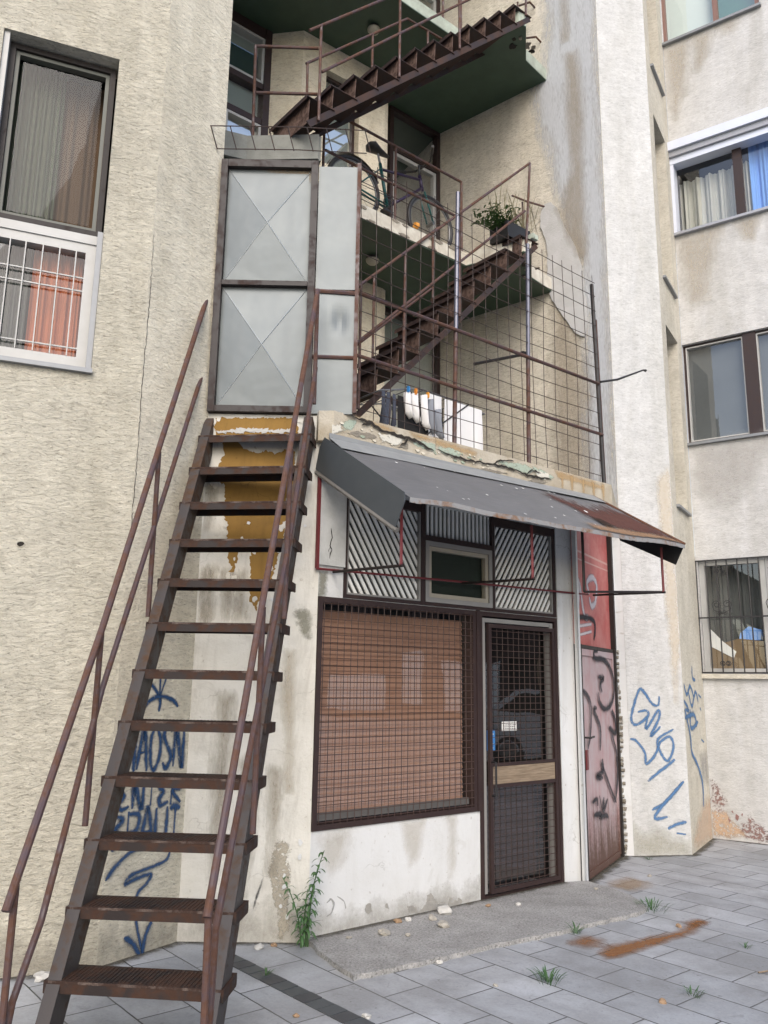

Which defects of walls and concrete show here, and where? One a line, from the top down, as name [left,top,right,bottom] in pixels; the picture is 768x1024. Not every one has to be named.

peeling [213,416,303,467]
peeling [332,420,554,483]
peeling [210,481,293,501]
peeling [222,515,286,539]
corrosion [545,472,679,542]
peeling [226,552,279,611]
peeling [711,779,768,841]
corrosion [603,920,704,958]